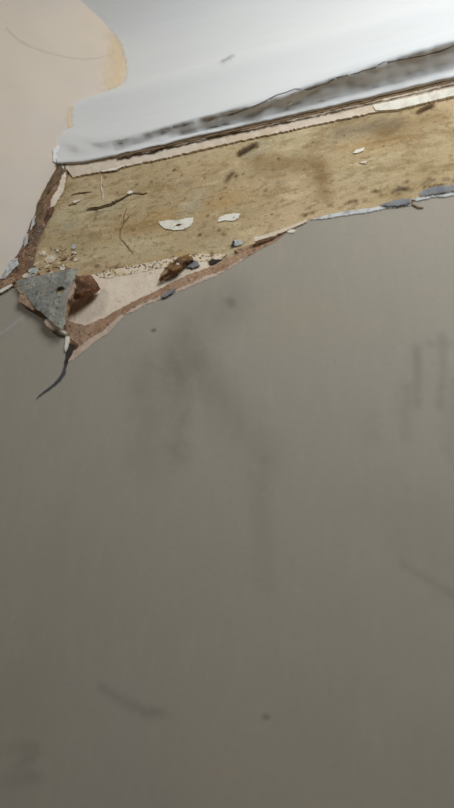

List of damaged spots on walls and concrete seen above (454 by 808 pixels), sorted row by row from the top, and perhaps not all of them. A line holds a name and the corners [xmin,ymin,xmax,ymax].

peeling [0,80,454,362]